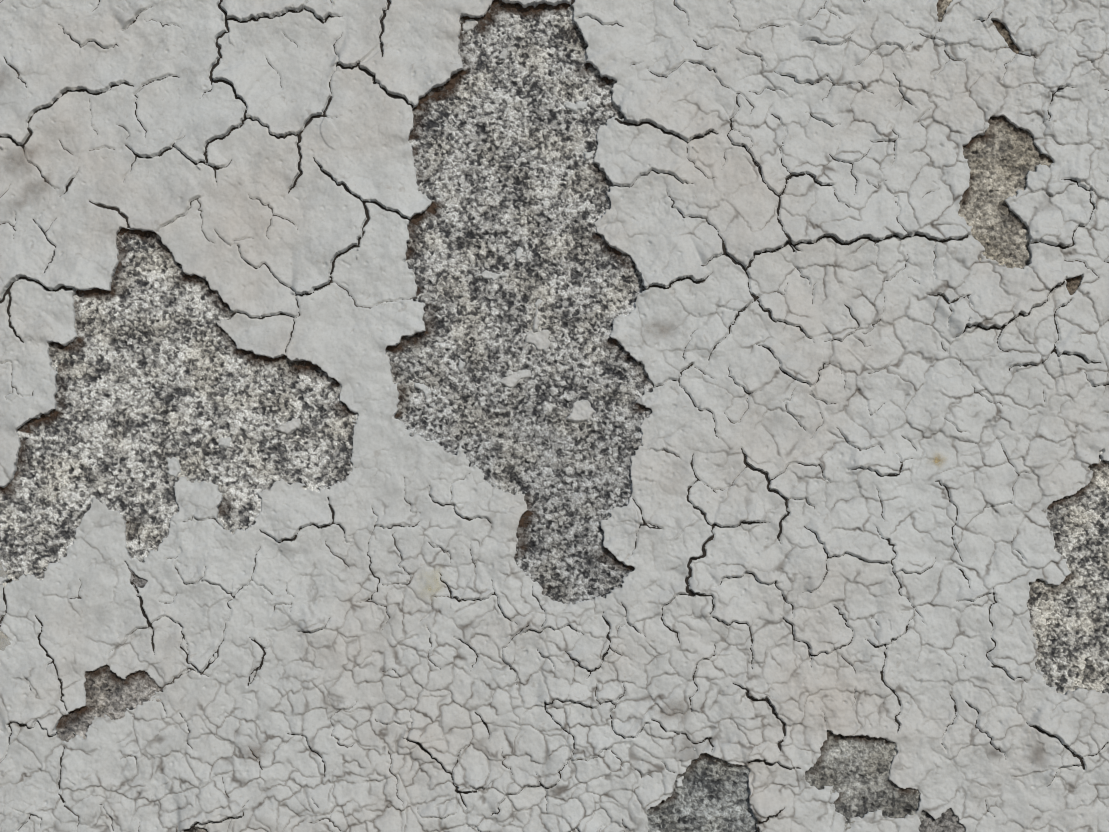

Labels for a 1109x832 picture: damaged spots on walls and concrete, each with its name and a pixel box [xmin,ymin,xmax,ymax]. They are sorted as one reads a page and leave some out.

peeling [0,232,359,596]
crack [0,0,417,400]
peeling [385,5,654,605]
crack [613,0,1109,770]
peeling [958,117,1053,269]
crack [0,579,12,631]
peeling [1027,450,1109,695]
crack [2,615,140,832]
peeling [646,748,758,832]
crack [757,808,785,832]
peeling [800,730,966,832]
crack [1026,722,1108,787]